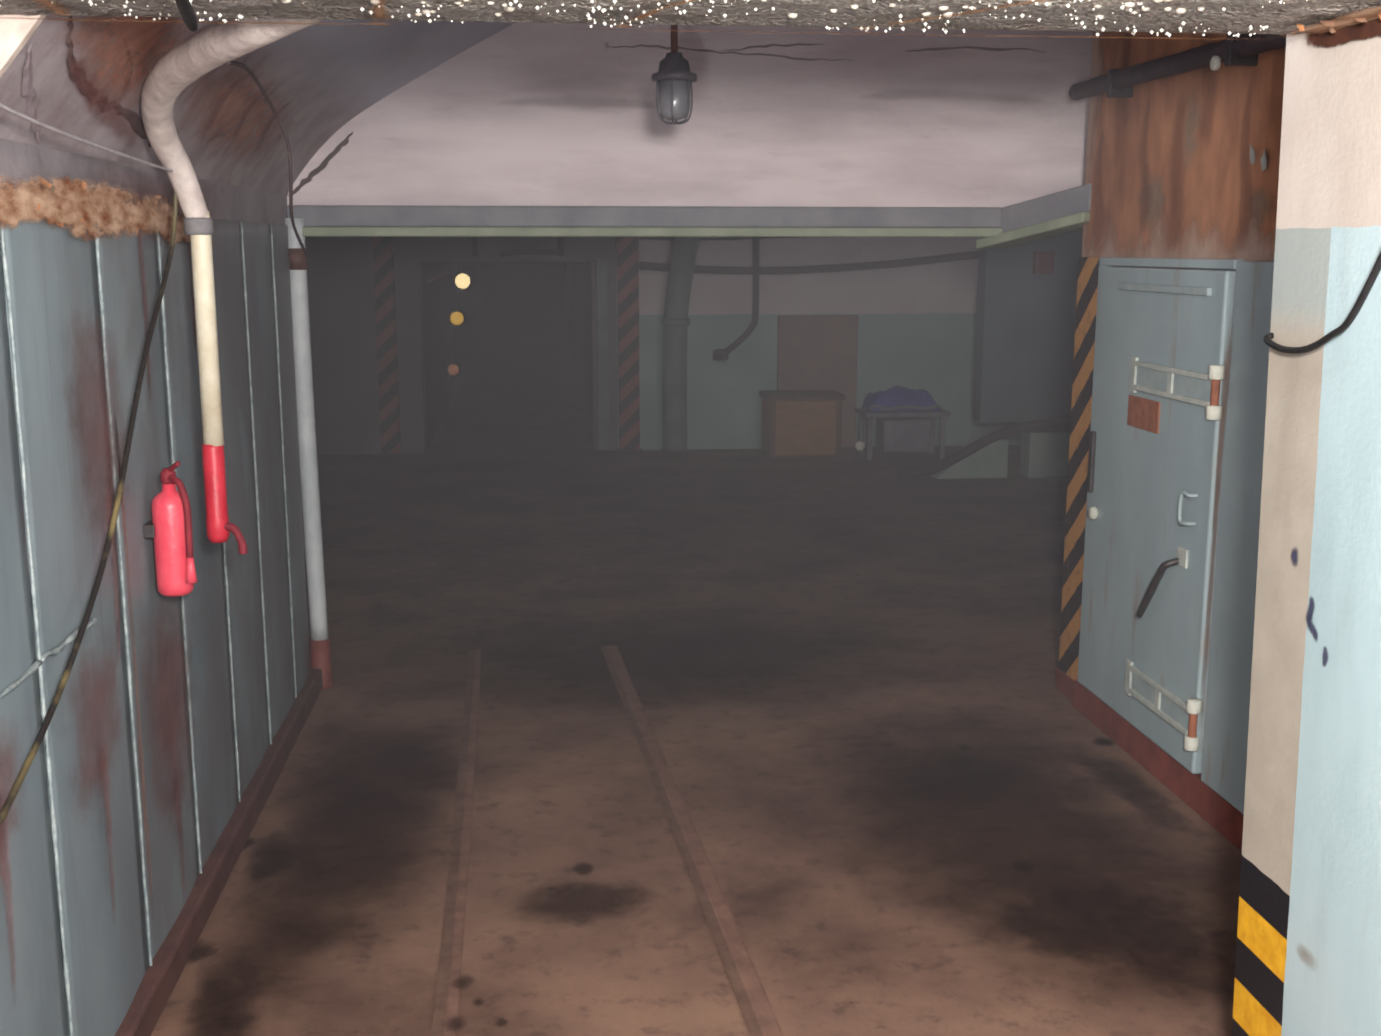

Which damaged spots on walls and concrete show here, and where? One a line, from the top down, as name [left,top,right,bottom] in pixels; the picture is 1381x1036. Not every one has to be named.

corrosion [34,0,337,95]
crack [607,43,855,61]
crack [906,45,1043,53]
corrosion [961,32,1226,75]
corrosion [1086,7,1381,254]
corrosion [0,176,191,244]